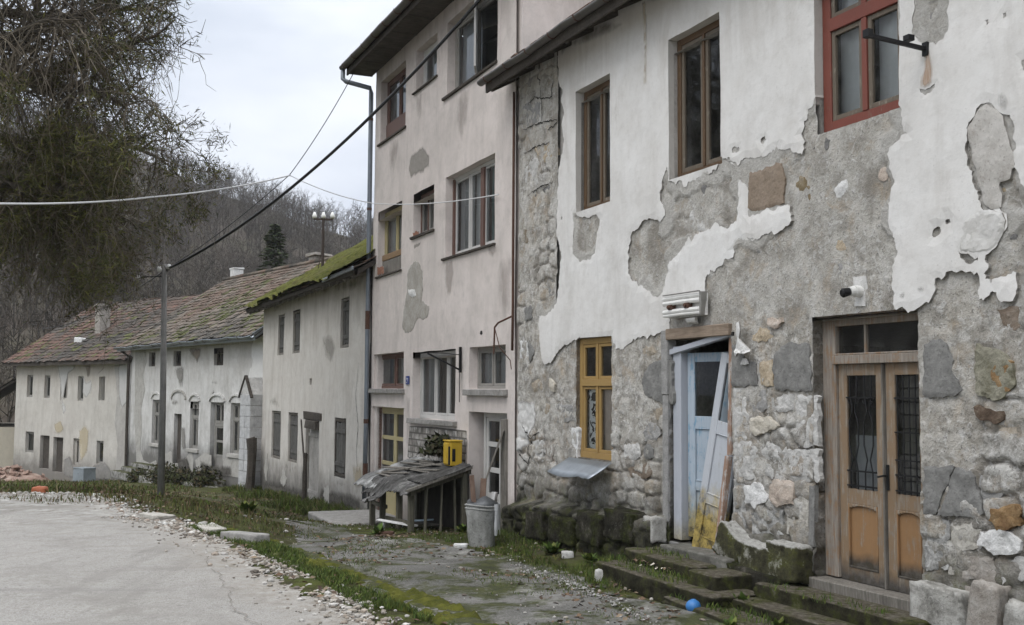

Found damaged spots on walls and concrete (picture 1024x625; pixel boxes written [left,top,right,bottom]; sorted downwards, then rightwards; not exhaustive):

flaking render [912,0,949,44]
crack [523,64,558,153]
flaking render [517,52,600,364]
flaking render [629,94,906,305]
peeling [949,104,1024,275]
flaking render [402,261,429,333]